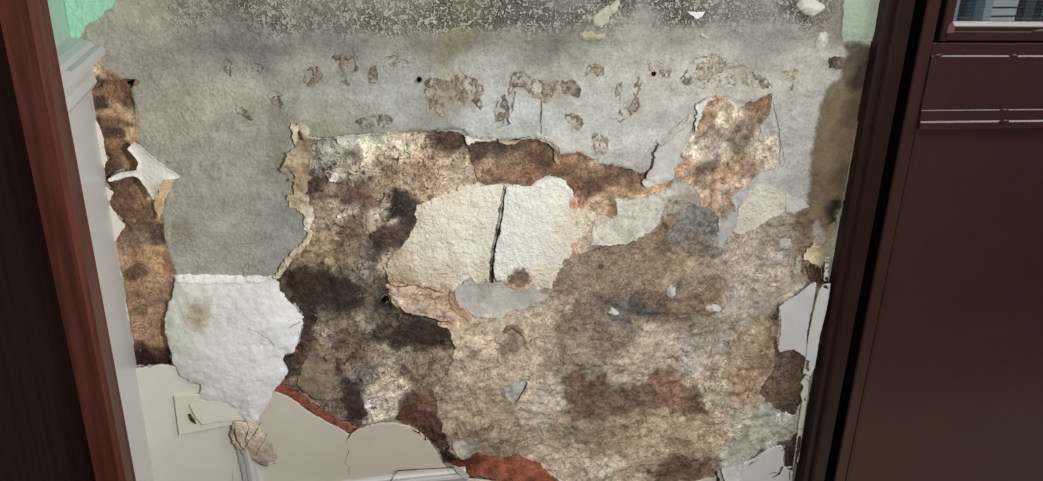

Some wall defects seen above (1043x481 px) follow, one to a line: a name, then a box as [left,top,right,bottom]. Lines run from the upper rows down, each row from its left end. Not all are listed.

damp [797,43,870,231]
spalling [92,54,835,481]
crack [491,186,507,283]